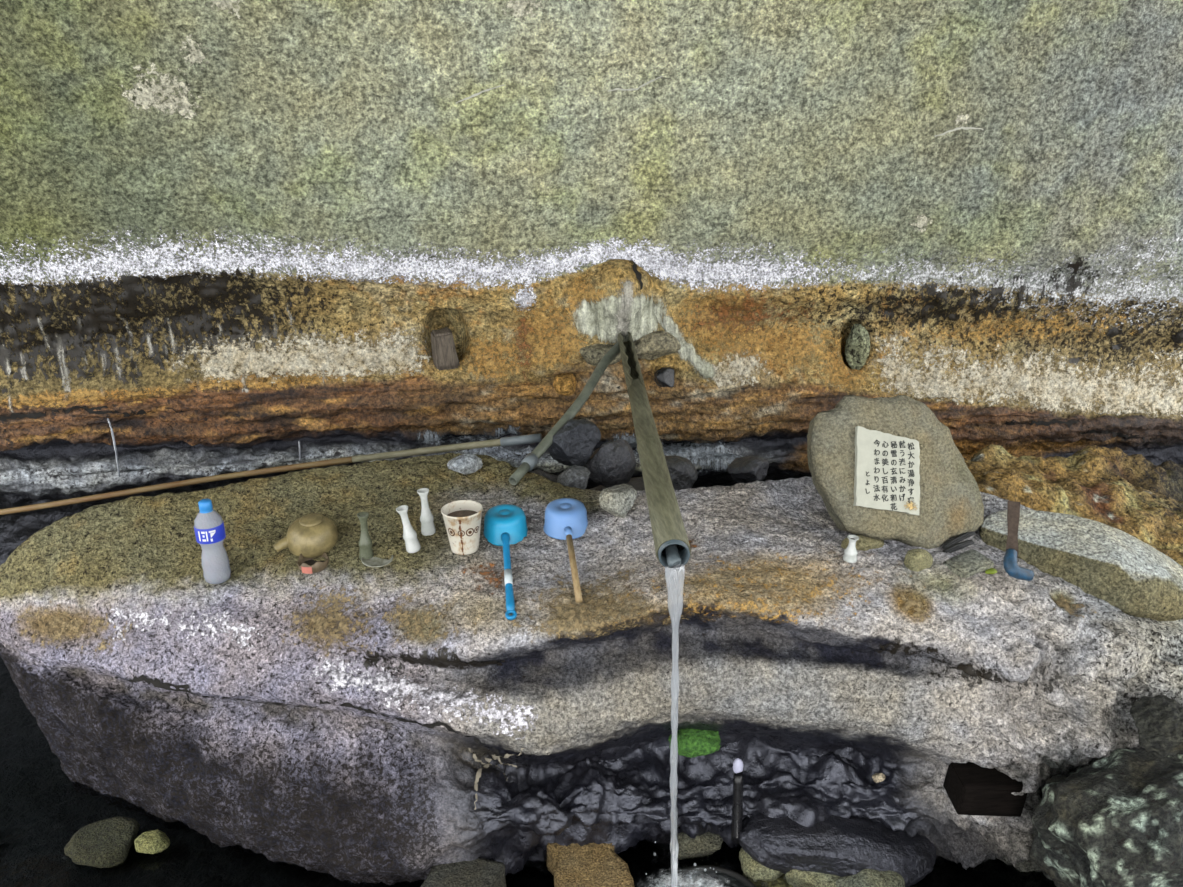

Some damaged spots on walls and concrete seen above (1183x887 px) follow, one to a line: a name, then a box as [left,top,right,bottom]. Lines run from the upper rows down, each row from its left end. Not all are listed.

damp [0,229,1183,418]
damp [418,425,520,446]